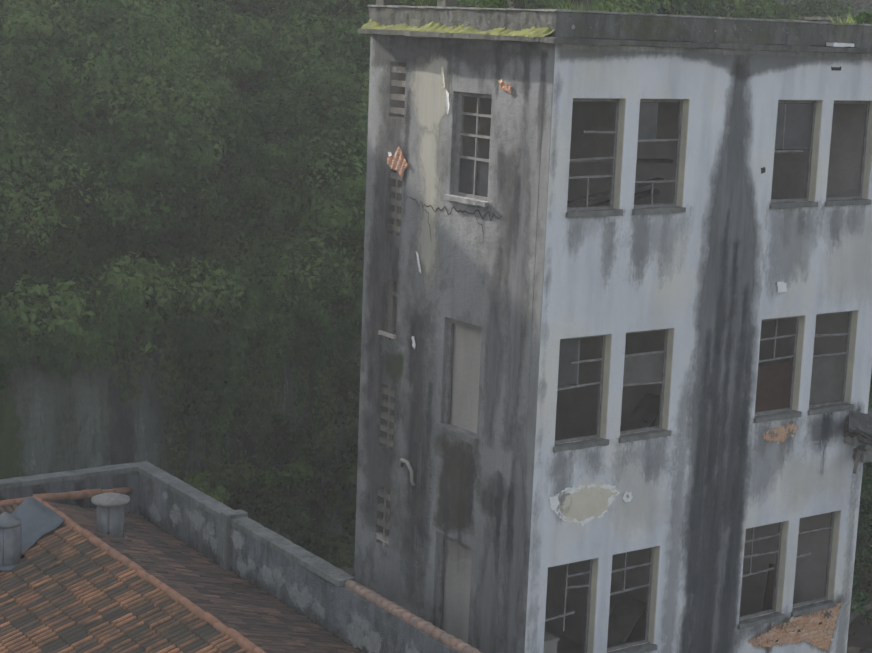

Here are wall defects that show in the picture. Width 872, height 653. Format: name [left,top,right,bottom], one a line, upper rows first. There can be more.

damp [524,51,545,145]
peeling [387,54,451,287]
crack [406,196,502,244]
damp [0,371,53,479]
damp [474,110,529,653]
damp [679,60,770,653]
damp [408,383,475,589]
peeling [549,482,633,526]
spalling [748,602,841,652]